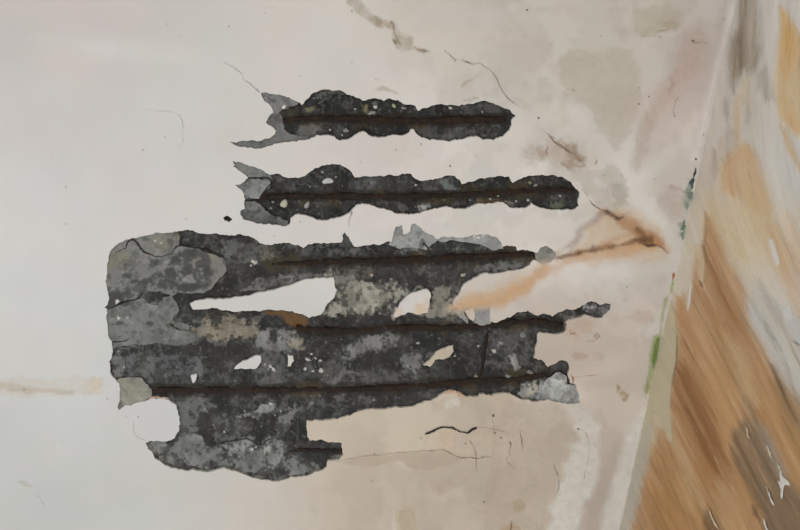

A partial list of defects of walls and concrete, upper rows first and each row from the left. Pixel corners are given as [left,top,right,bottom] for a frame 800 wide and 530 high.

spalling [232,89,515,149]
spalling [224,161,579,226]
corrosion [556,209,664,263]
corrosion [458,265,551,309]
spalling [106,223,610,481]
crack [425,427,523,464]